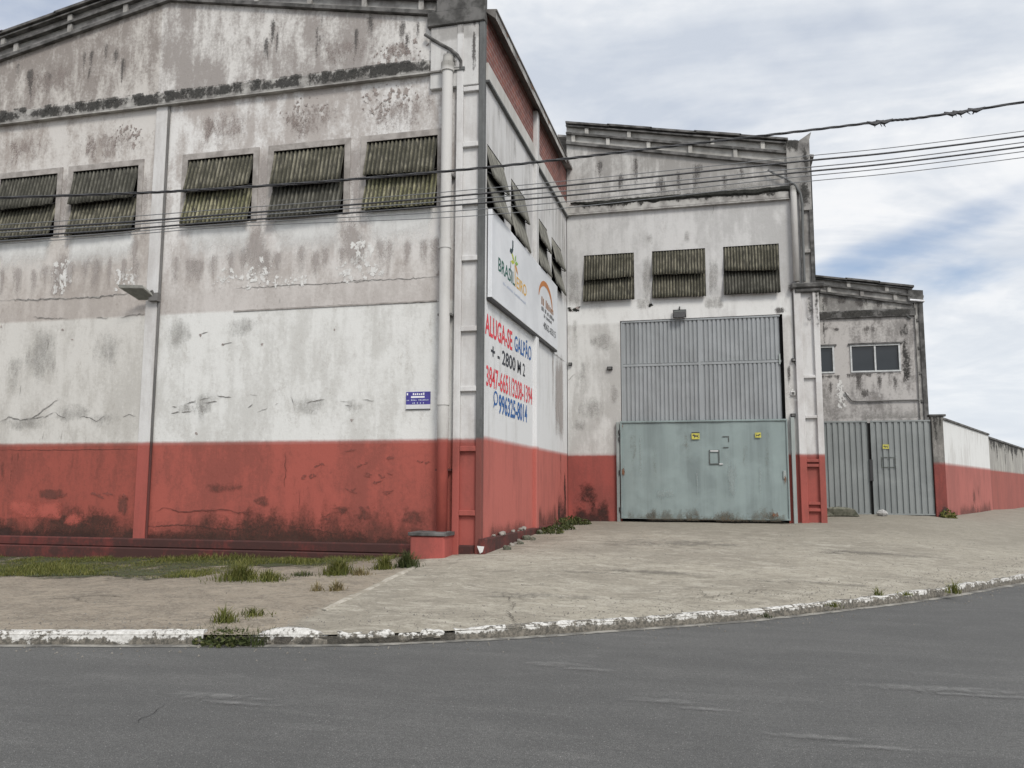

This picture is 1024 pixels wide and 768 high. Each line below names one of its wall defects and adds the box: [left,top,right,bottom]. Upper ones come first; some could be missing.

water stain [0,21,430,123]
peeling [52,259,73,294]
peeling [115,267,139,291]
peeling [213,256,307,290]
peeling [336,236,385,284]
crack [2,400,133,451]
water stain [0,499,133,538]
water stain [148,512,410,544]
water stain [539,480,608,524]